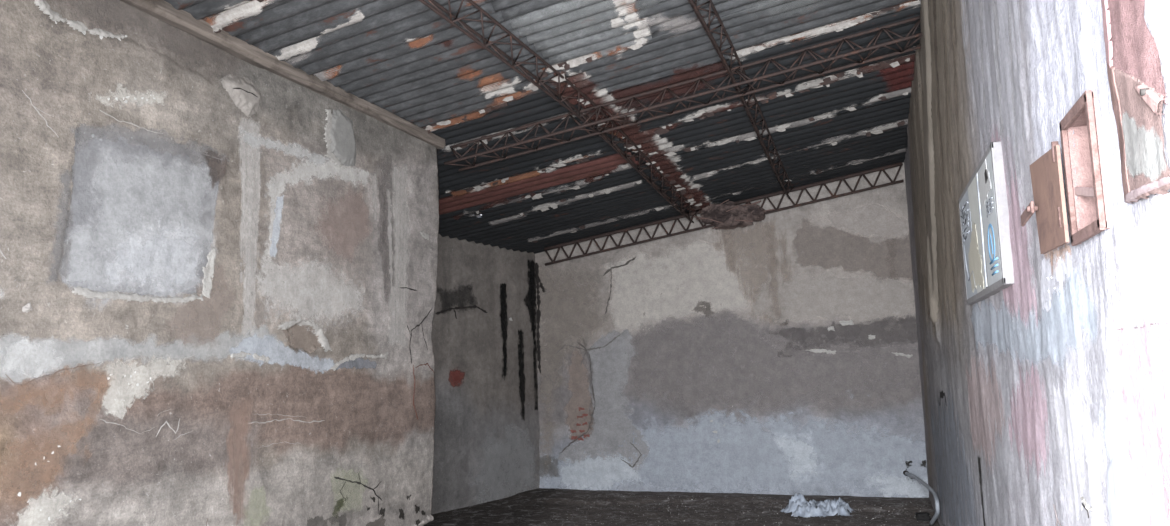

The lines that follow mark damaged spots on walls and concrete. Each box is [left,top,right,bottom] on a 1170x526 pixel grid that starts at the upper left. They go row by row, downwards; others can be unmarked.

peeling [276,11,364,64]
rust [407,34,452,48]
peeling [611,0,709,39]
peeling [422,80,541,134]
peeling [446,151,603,197]
rust [454,0,920,219]
peeling [644,53,915,136]
peeling [649,86,912,156]
peeling [682,118,908,185]
water stain [470,0,1026,526]
peeling [769,314,918,358]
peeling [559,329,649,473]